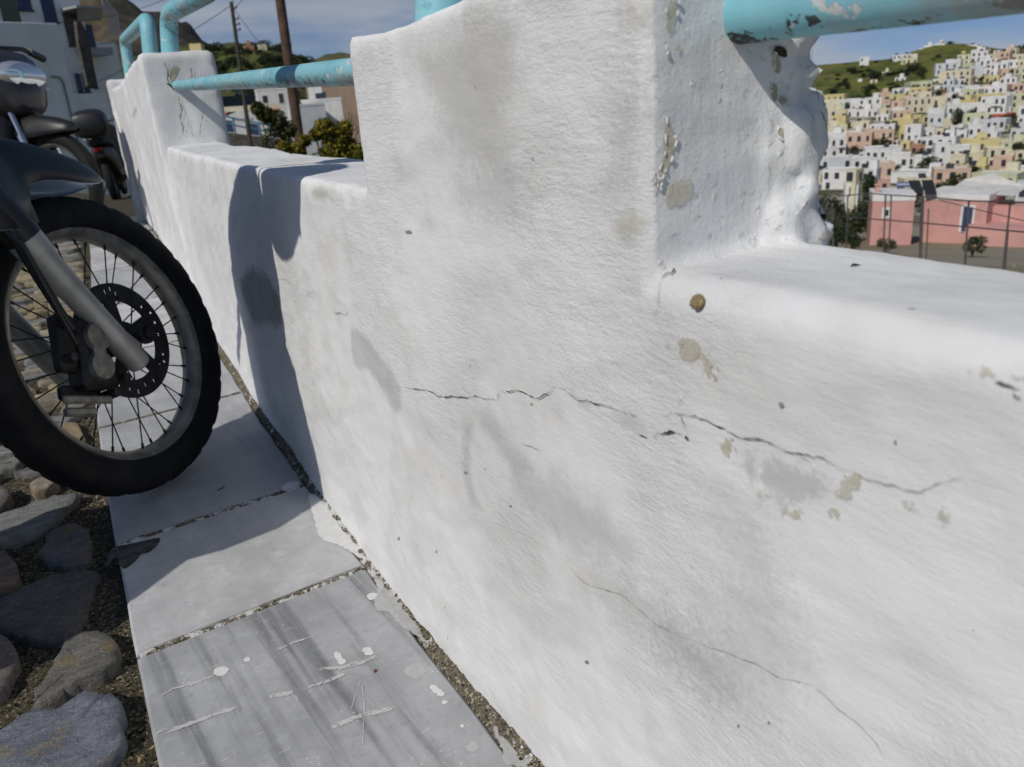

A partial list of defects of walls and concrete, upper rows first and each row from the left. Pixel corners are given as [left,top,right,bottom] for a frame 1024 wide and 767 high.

peeling [653,117,693,207]
peeling [677,338,718,378]
crack [409,386,960,493]
peeling [828,472,861,518]